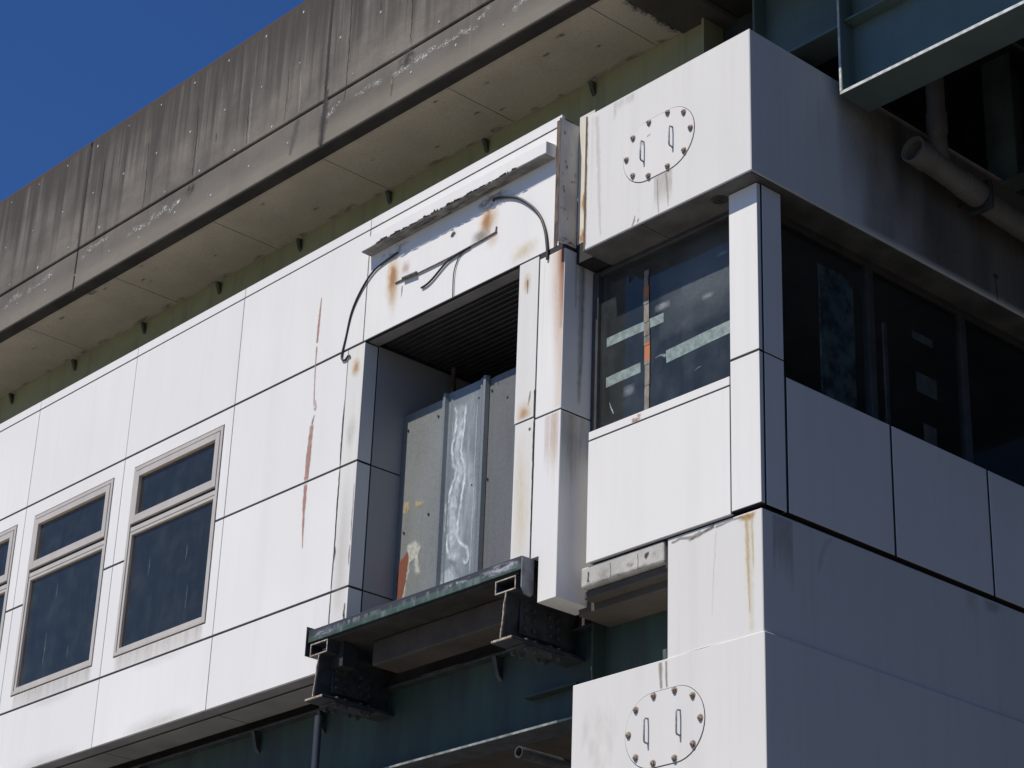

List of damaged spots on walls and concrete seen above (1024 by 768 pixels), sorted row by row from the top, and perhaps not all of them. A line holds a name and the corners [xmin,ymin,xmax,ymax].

leakage [319,0,339,144]
corrosion [388,266,396,291]
peeling [376,167,516,244]
corrosion [475,211,492,241]
corrosion [302,298,322,547]
leakage [446,408,469,564]